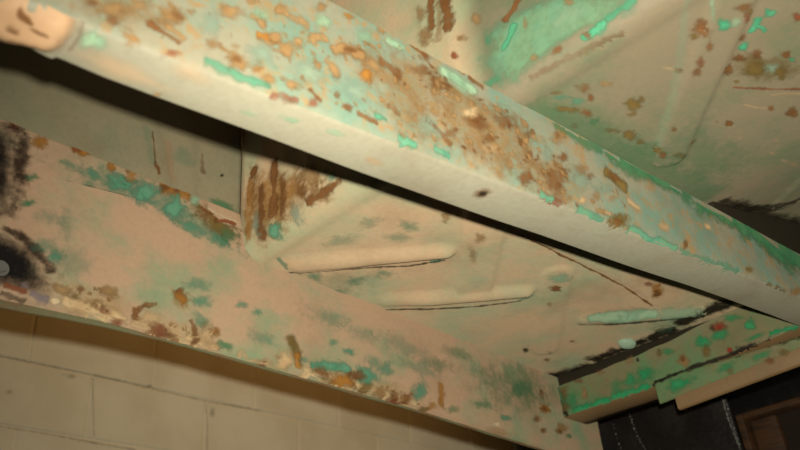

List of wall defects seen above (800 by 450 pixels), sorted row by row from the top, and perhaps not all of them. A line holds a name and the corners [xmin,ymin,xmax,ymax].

peeling [205,57,270,88]
peeling [440,67,477,94]
peeling [488,0,636,85]
rust [250,0,639,231]
peeling [88,169,160,203]
rust [152,131,342,240]
crack [509,232,681,325]
rust [53,284,220,351]
peeling [587,308,701,324]
rust [237,336,444,412]
peeling [570,368,652,413]
leakage [653,343,758,387]